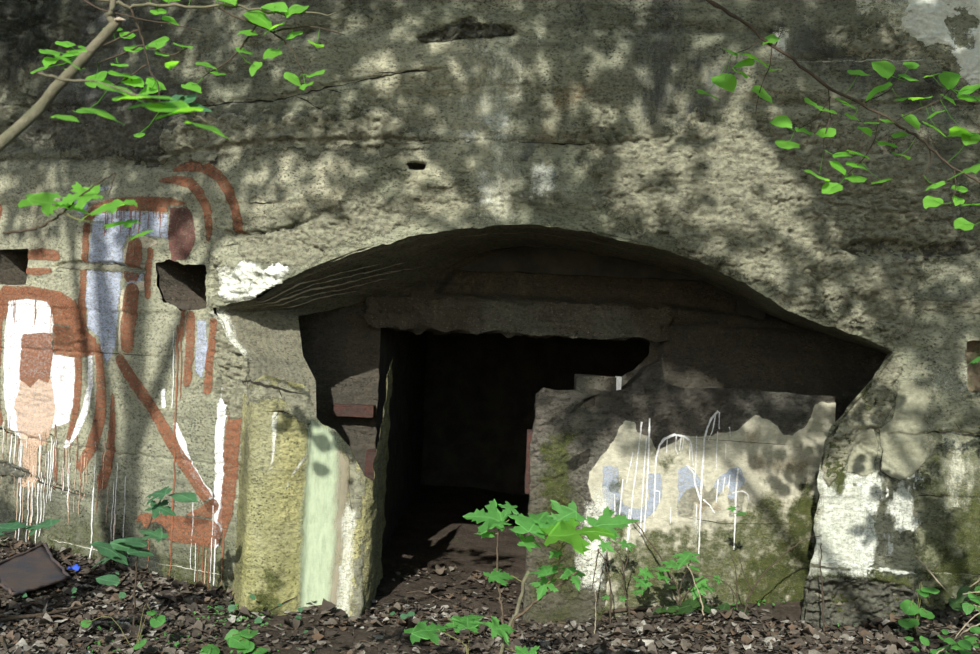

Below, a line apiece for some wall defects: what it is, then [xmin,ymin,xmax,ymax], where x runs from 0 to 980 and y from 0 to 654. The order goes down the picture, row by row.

spalling [418,17,515,43]
spalling [841,21,980,134]
leakage [947,439,972,506]